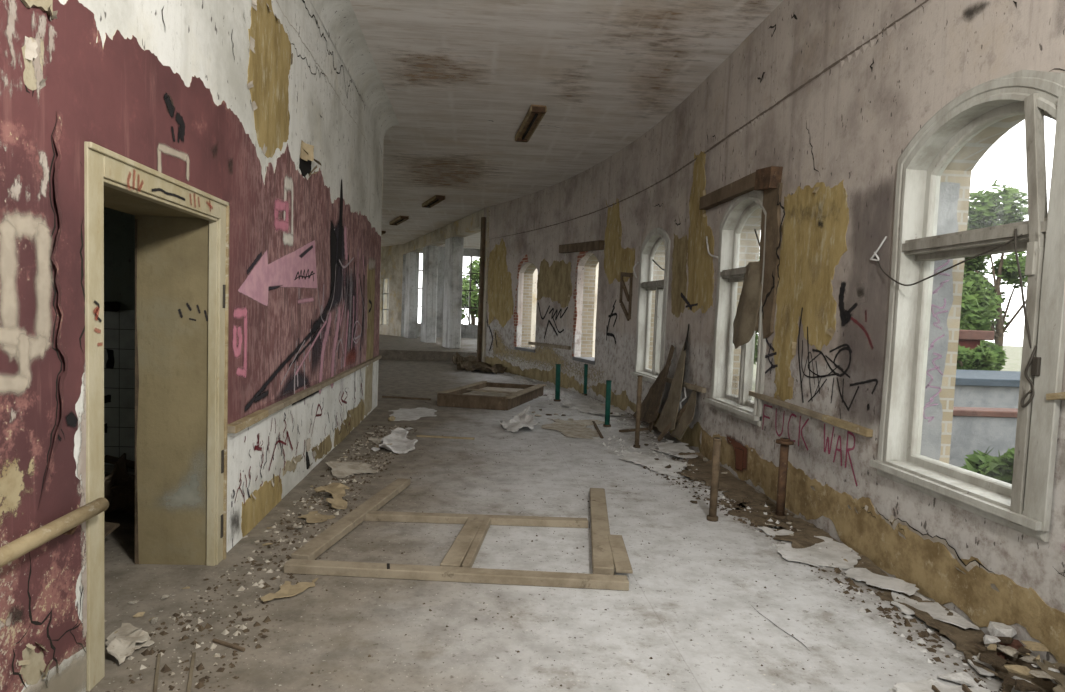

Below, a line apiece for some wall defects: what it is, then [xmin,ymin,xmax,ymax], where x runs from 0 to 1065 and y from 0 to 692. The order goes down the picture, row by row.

flaking render [2,36,47,96]
flaking render [21,0,58,22]
flaking render [247,0,293,158]
crack [289,0,366,106]
peeling [9,151,49,199]
crack [38,111,85,510]
flaking render [485,238,636,412]
flaking render [670,151,714,318]
flaking render [773,180,849,401]
flaking render [241,363,373,539]
crack [12,552,86,687]
flaking render [669,419,1065,664]